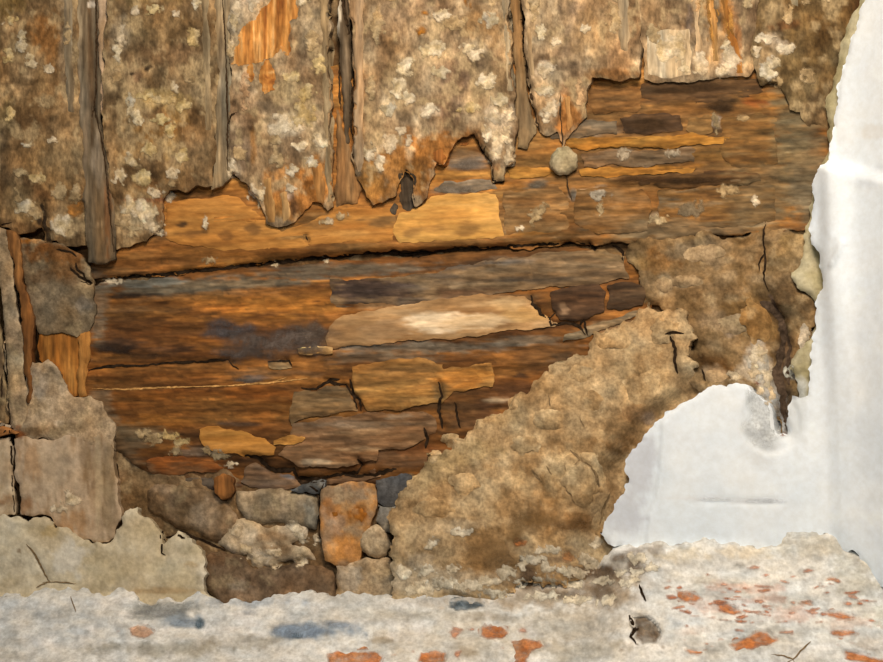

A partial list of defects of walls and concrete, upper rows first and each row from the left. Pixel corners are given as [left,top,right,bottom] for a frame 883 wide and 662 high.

peeling [125,74,195,138]
peeling [364,127,412,172]
peeling [365,27,451,117]
peeling [457,72,515,166]
damp [667,83,725,93]
peeling [753,32,795,88]
peeling [110,142,189,237]
spalling [390,169,417,215]
crack [57,236,625,285]
crack [1,333,17,512]
peeling [135,428,188,455]
crack [424,382,461,448]